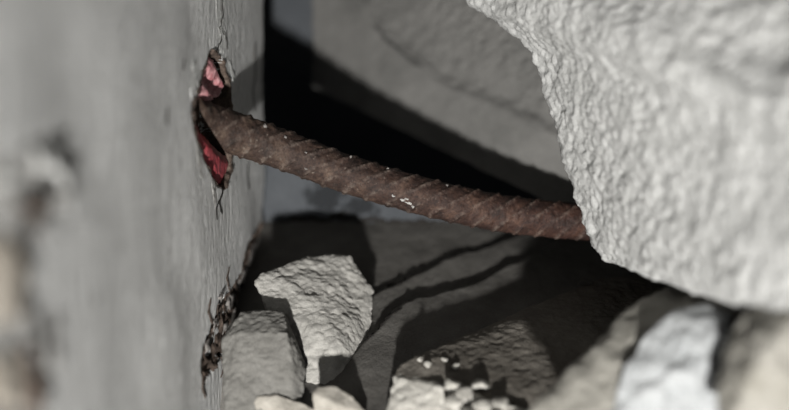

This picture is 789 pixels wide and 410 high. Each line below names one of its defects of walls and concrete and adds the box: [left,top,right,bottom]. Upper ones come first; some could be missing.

crack [217,4,228,51]
spalling [190,0,590,241]